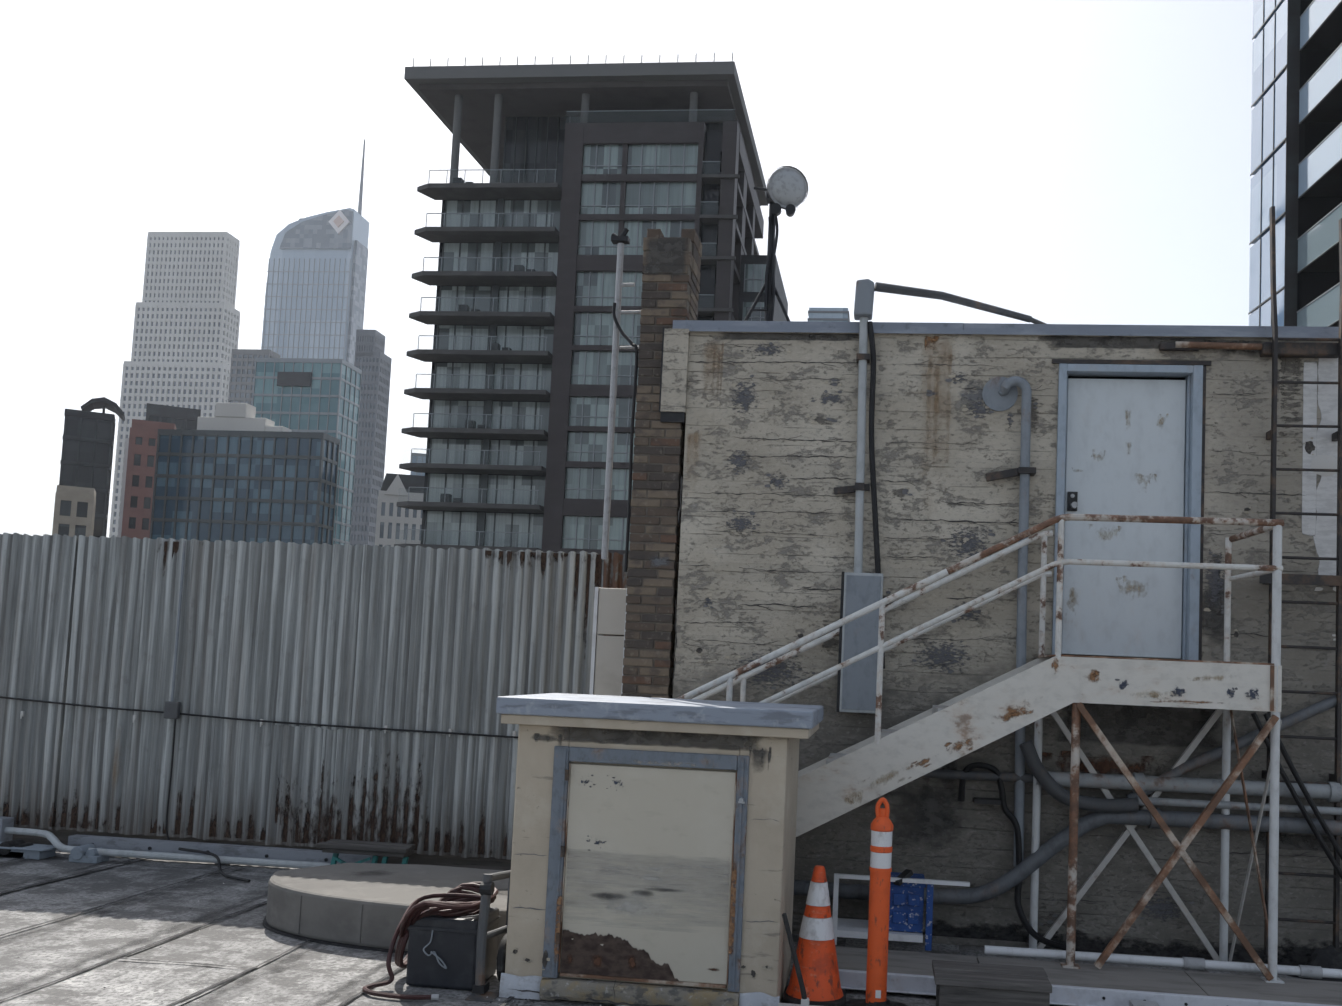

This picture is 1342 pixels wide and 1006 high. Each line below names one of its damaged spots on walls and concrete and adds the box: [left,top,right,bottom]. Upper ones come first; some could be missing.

peeling [807,378,846,425]
peeling [1031,397,1041,429]
peeling [893,488,912,501]
peeling [941,524,995,566]
rust [485,550,602,639]
peeling [945,601,981,623]
peeling [1203,549,1233,615]
peeling [912,639,971,676]
peeling [1227,687,1259,700]
rust [3,797,121,831]
rust [143,790,195,835]
rust [209,757,507,856]